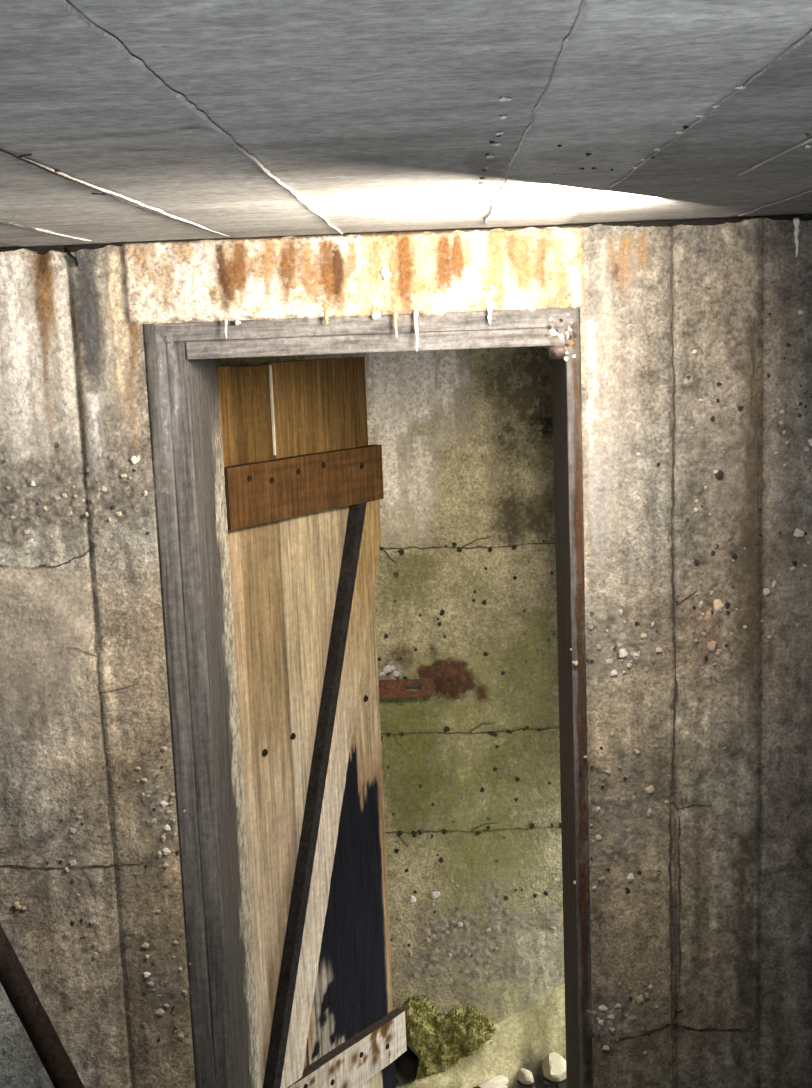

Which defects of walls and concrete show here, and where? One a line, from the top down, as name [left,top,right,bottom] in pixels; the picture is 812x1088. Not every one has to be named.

crack [0,149,812,267]
corrosion [217,243,247,307]
corrosion [264,240,356,301]
corrosion [371,238,413,301]
corrosion [437,236,468,291]
damp [303,349,473,534]
damp [487,346,553,476]
crack [379,537,556,564]
crack [0,417,152,902]
corrosion [418,646,486,700]
crack [609,252,759,1088]
crack [385,823,561,847]